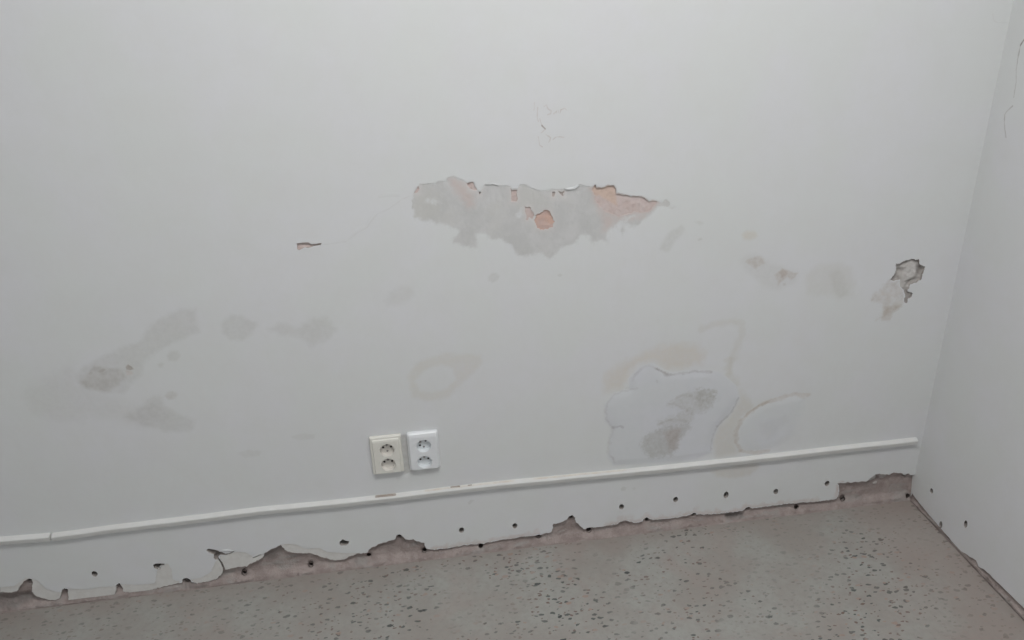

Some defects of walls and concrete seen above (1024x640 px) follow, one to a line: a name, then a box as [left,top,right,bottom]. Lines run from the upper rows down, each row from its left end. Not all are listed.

peeling [409,175,681,261]
spalling [866,259,924,324]
leakage [5,303,346,440]
peeling [420,468,633,493]
spalling [0,473,1024,621]